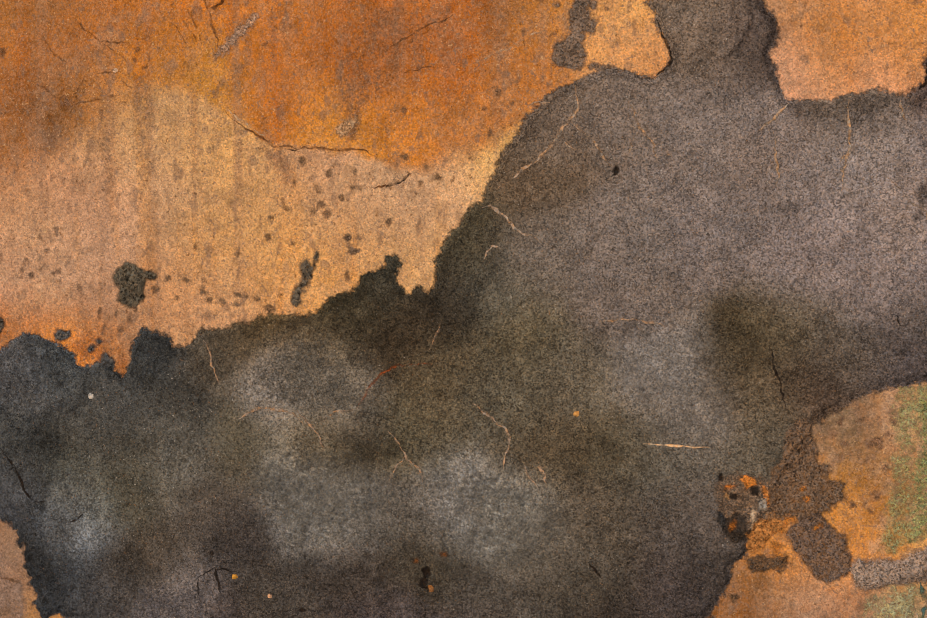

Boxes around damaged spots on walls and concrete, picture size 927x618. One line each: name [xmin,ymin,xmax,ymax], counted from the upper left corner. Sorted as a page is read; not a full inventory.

crack [227,110,379,161]
damp [793,90,927,128]
damp [0,339,102,618]
damp [73,203,732,618]
damp [694,304,921,445]